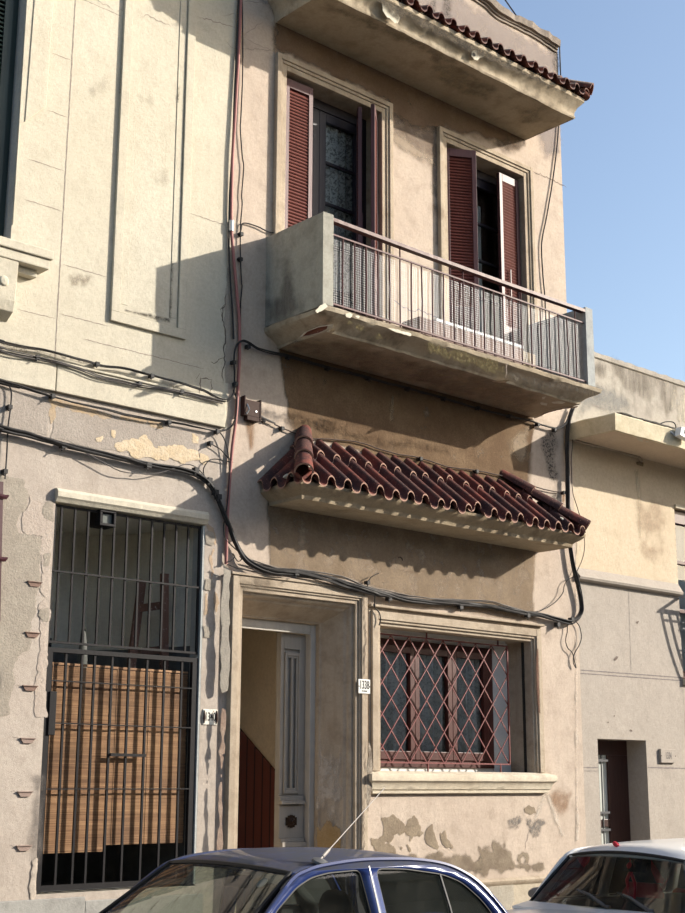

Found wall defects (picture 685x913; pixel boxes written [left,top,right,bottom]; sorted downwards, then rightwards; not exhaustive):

water stain [378,0,557,89]
crack [196,293,227,393]
peeling [48,398,209,464]
mould [542,434,558,481]
peeling [22,495,53,718]
peeling [317,758,341,848]